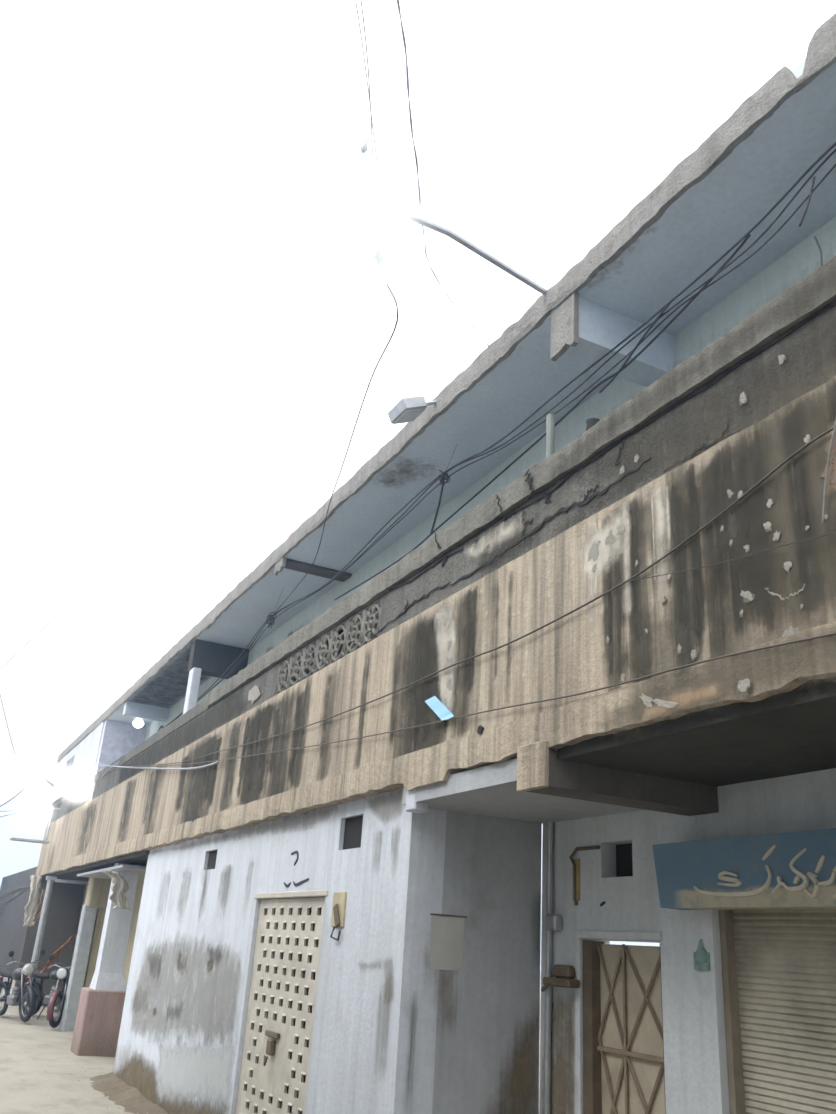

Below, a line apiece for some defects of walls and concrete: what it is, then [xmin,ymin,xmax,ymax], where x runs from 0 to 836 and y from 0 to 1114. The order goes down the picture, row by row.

water stain [480,514,531,567]
crack [371,300,836,639]
water stain [577,313,836,722]
flaking render [763,499,780,542]
flaking render [739,591,755,617]
water stain [129,646,208,708]
water stain [119,685,310,842]
water stain [319,680,334,780]
water stain [356,656,368,763]
water stain [390,590,476,756]